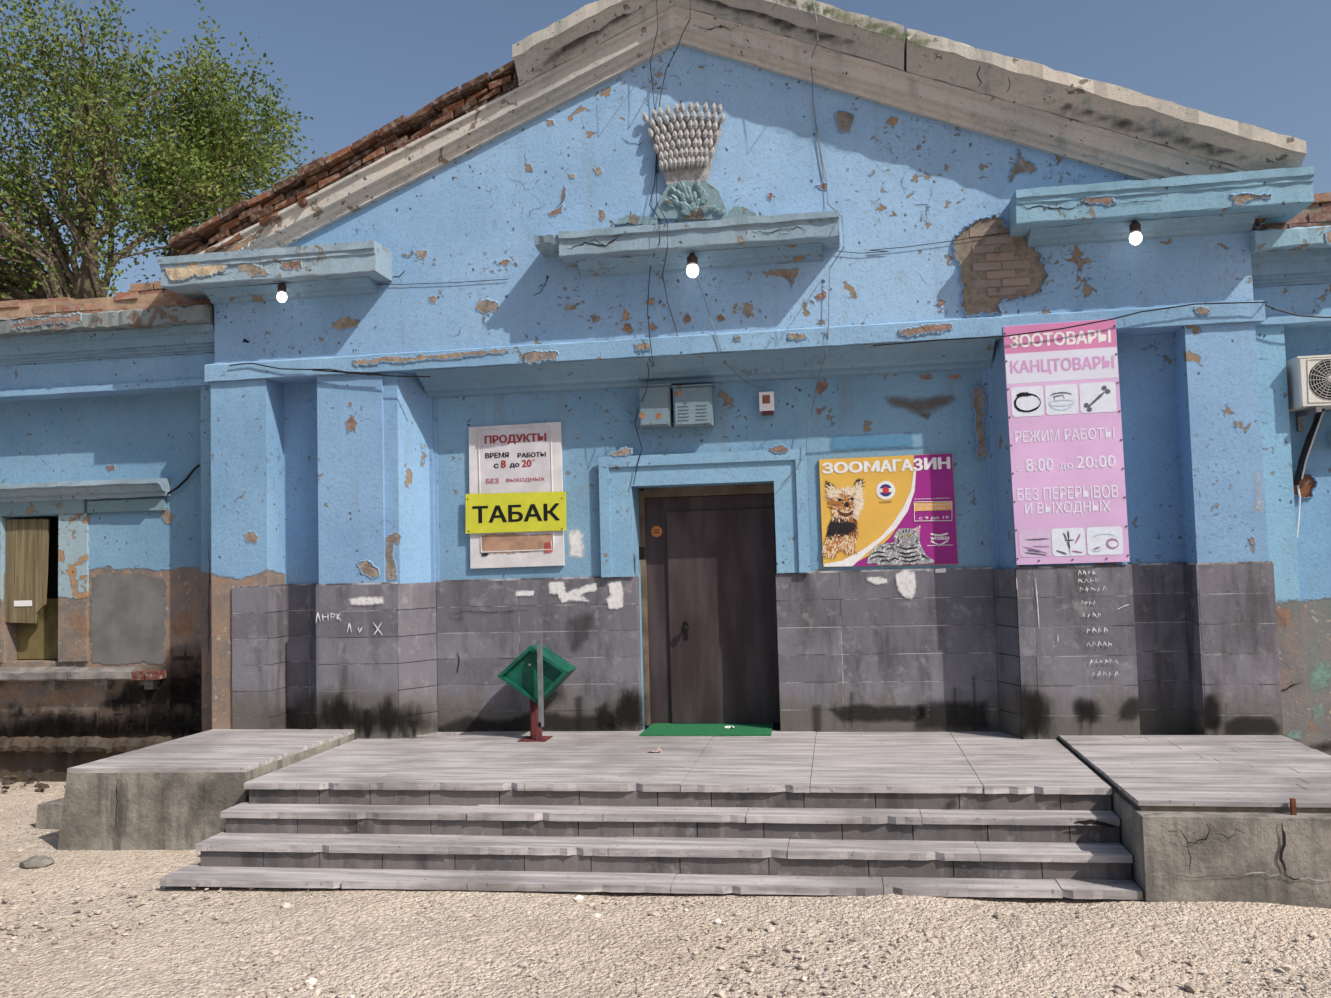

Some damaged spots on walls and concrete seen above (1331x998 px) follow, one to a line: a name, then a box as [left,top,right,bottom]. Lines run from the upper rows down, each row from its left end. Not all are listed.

flaking render [833,110,856,134]
flaking render [1008,148,1038,183]
spalling [898,214,1048,338]
peeling [917,372,989,459]
spalling [1293,471,1318,500]
damp [0,617,202,738]
damp [833,702,988,729]
damp [1121,699,1140,718]
damp [1213,716,1280,735]
crack [1074,819,1116,828]
crack [1150,823,1330,895]